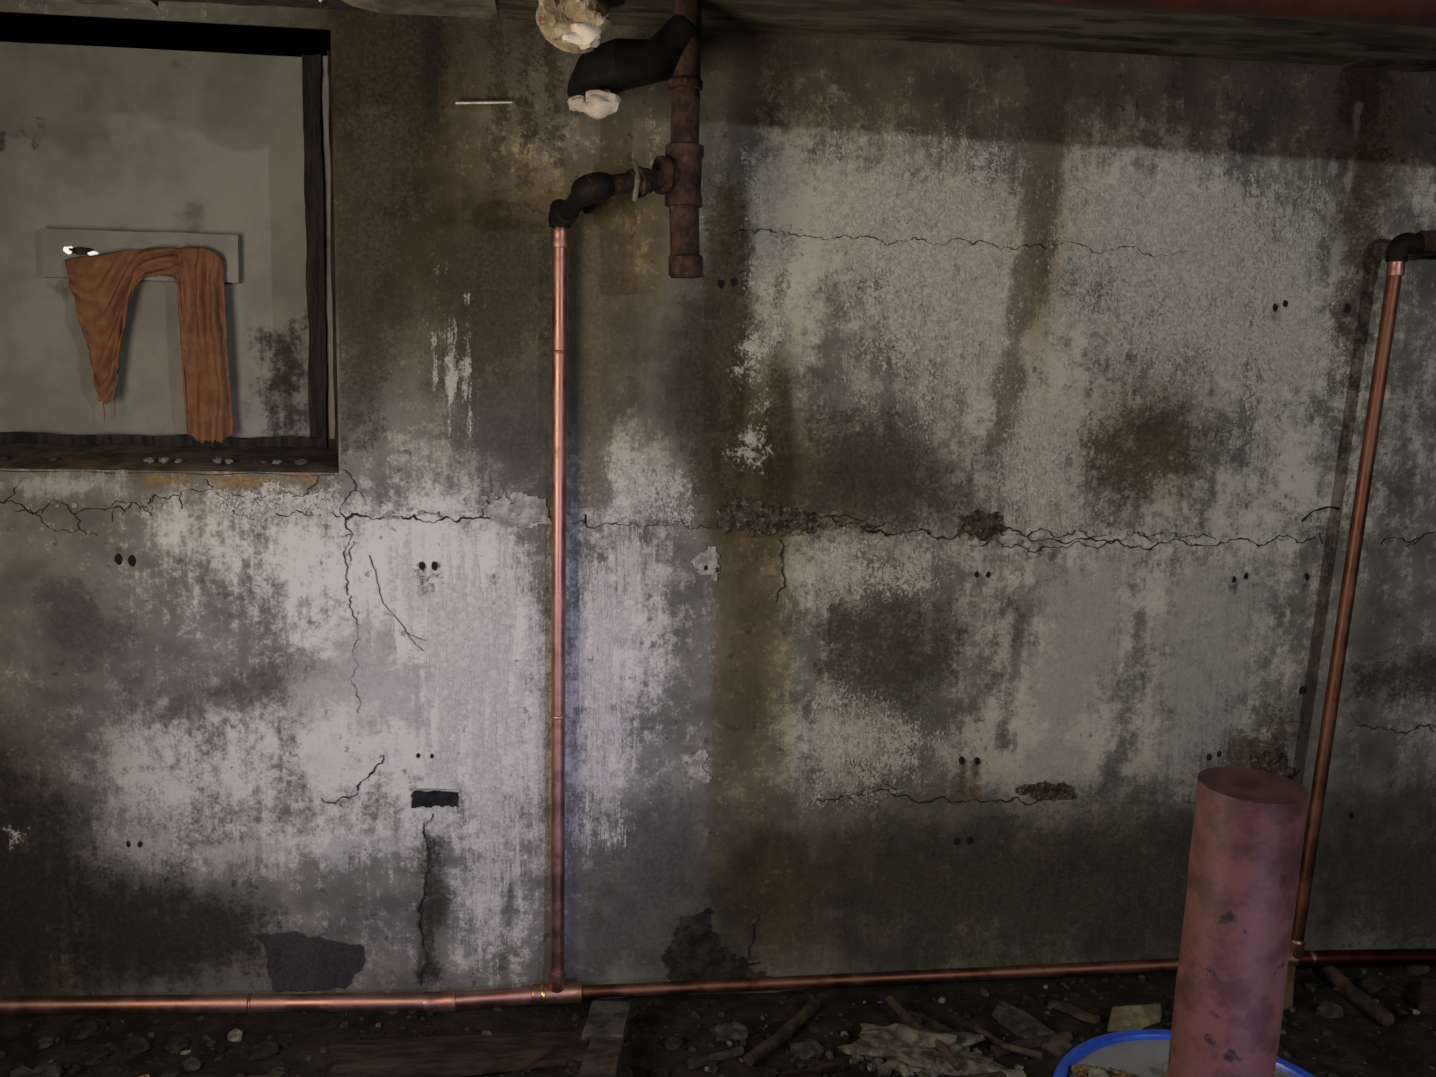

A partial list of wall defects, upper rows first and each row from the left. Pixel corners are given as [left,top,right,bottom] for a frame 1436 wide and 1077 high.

crack [733,228,1188,257]
leakage [567,48,1397,977]
crack [1381,532,1435,547]
crack [0,470,1339,712]
crack [321,755,384,804]
crack [819,783,1062,806]
leakage [0,774,366,995]
crack [418,814,434,986]
spalling [661,908,771,981]